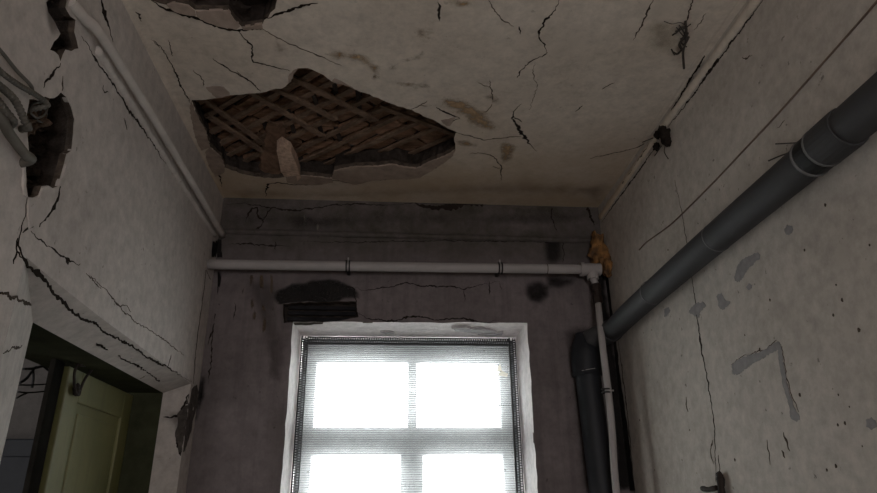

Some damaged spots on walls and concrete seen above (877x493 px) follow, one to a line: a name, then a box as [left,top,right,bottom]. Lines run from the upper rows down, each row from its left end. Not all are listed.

flaking render [21,96,76,229]
flaking render [46,0,72,53]
crack [136,0,340,101]
flaking render [190,68,456,185]
crack [413,1,559,180]
crack [586,0,763,225]
crack [0,292,31,306]
crack [13,186,236,384]
peeling [734,252,760,290]
flaking render [165,385,199,456]
crack [691,277,720,480]
peeling [731,340,801,422]